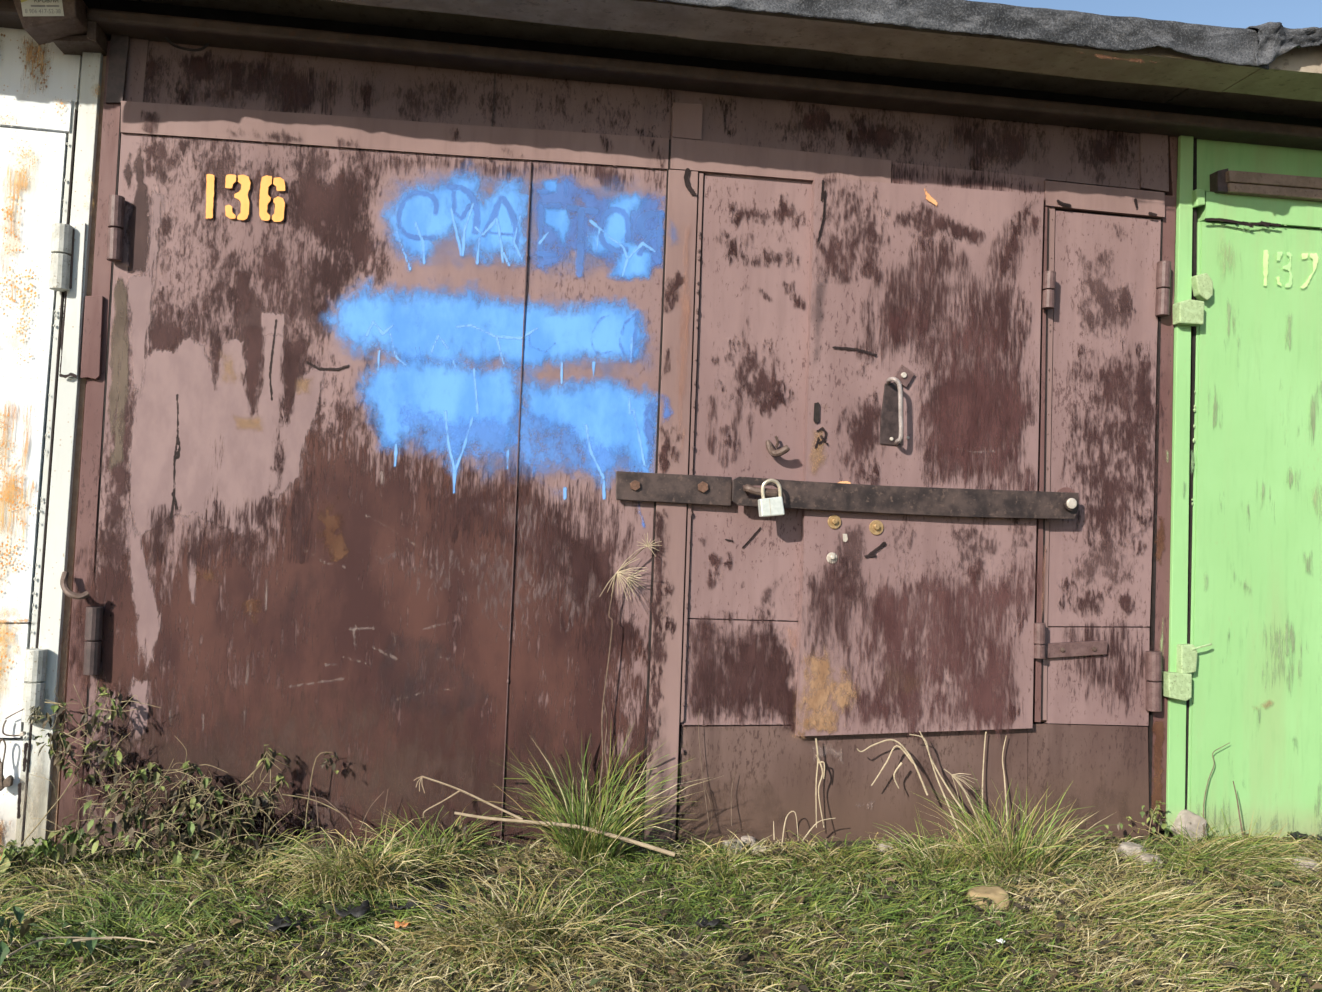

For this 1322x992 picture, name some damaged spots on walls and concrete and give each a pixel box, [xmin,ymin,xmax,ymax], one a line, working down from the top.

corrosion [18,38,51,90]
corrosion [0,140,39,361]
corrosion [0,403,36,593]
corrosion [317,497,349,562]
corrosion [798,648,856,738]